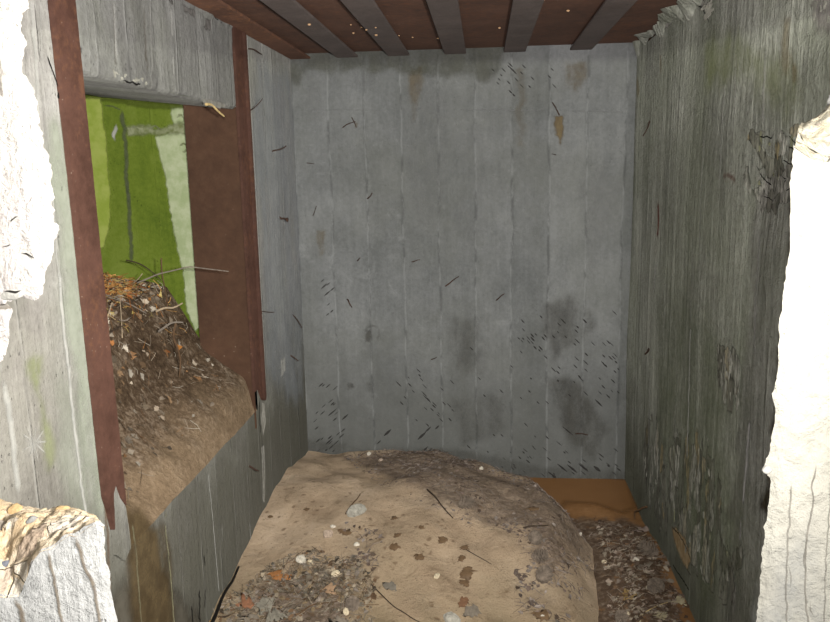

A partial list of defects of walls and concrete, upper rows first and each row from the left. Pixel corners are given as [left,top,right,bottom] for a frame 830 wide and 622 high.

spalling [633,0,714,59]
corrosion [554,116,563,144]
spalling [743,124,799,215]
peeling [717,341,740,412]
peeling [641,415,744,612]